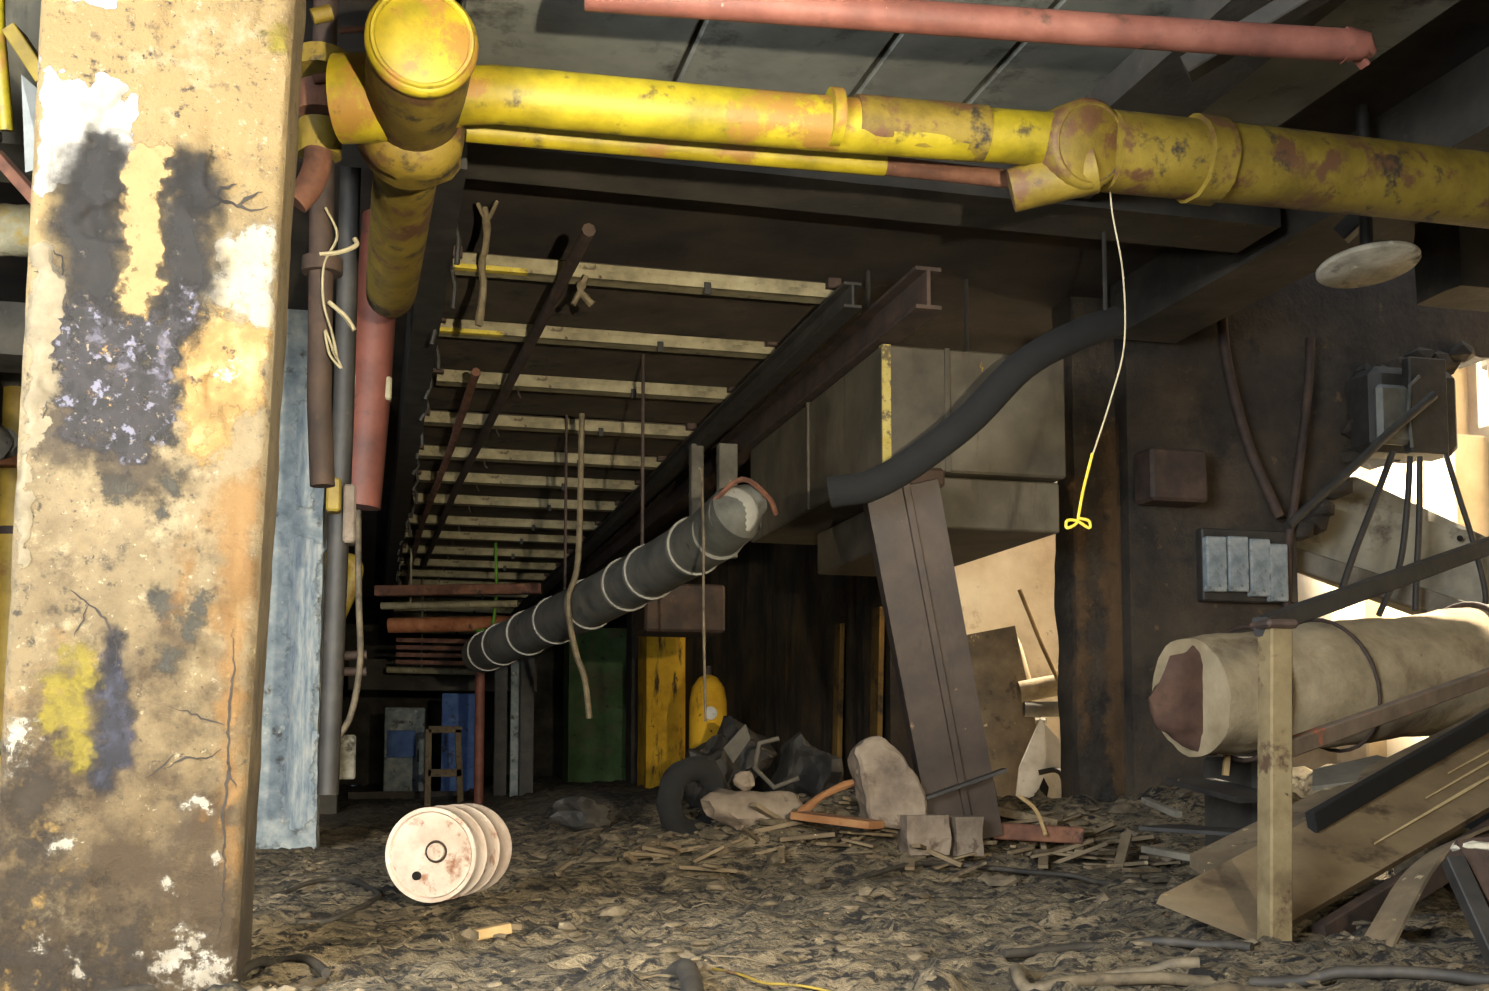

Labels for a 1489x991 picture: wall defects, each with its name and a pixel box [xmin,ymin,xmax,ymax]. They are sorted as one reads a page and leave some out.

spalling [73,0,117,10]
leakage [72,131,128,232]
leakage [179,152,225,216]
peeling [33,56,279,476]
leakage [33,406,186,521]
peeling [291,400,314,509]
leakage [146,585,214,674]
peeling [280,536,324,832]